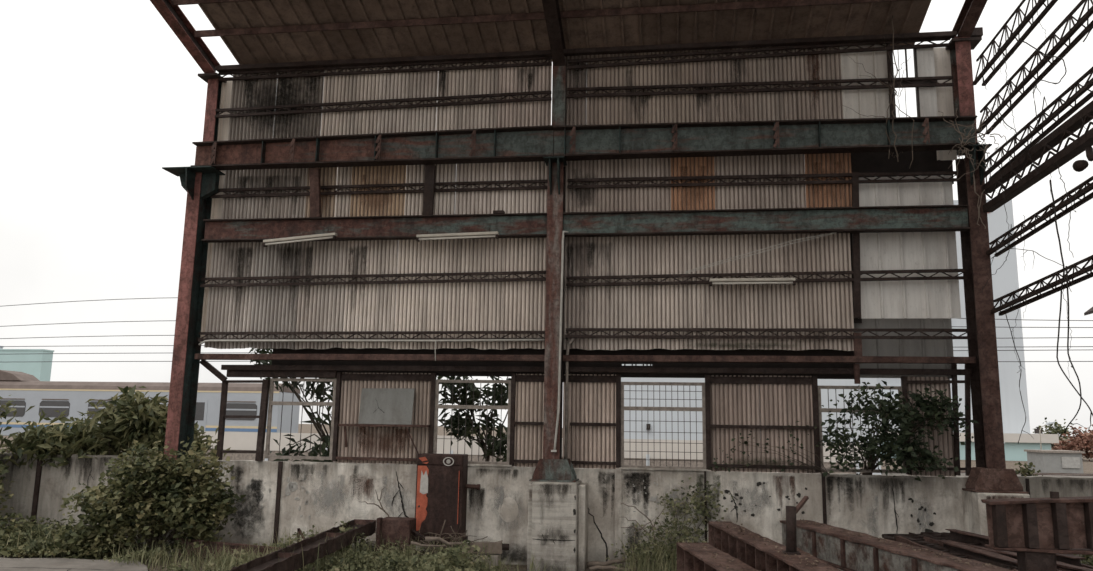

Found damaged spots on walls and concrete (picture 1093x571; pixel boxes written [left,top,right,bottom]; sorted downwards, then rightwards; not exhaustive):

damp [231,467,262,538]
damp [470,489,484,507]
damp [599,473,650,503]
damp [827,477,904,528]